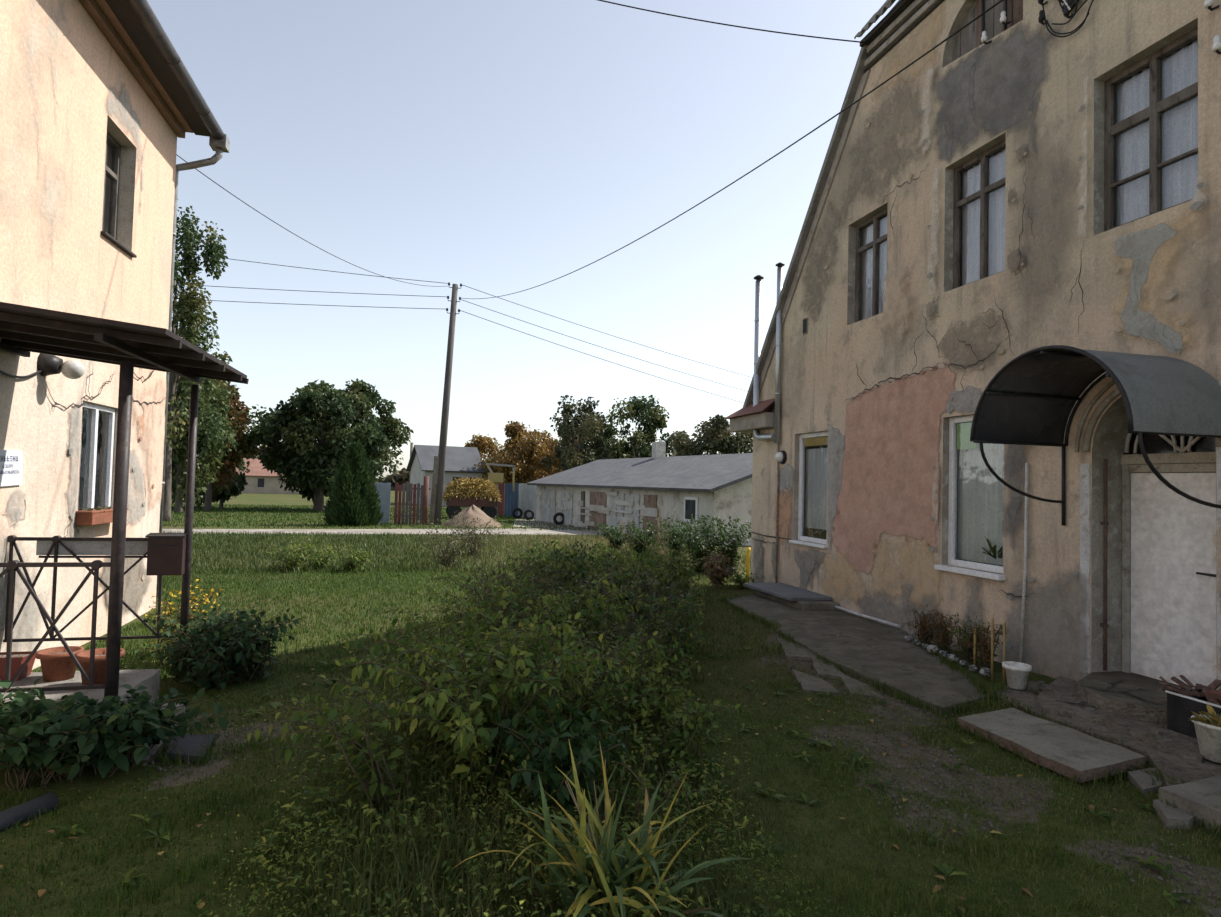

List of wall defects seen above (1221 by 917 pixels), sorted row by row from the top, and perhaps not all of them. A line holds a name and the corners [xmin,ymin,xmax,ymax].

damp [24,0,66,99]
crack [846,162,1035,400]
crack [1068,243,1085,332]
crack [45,363,164,412]
flaking render [936,306,1015,376]
peeling [126,380,167,526]